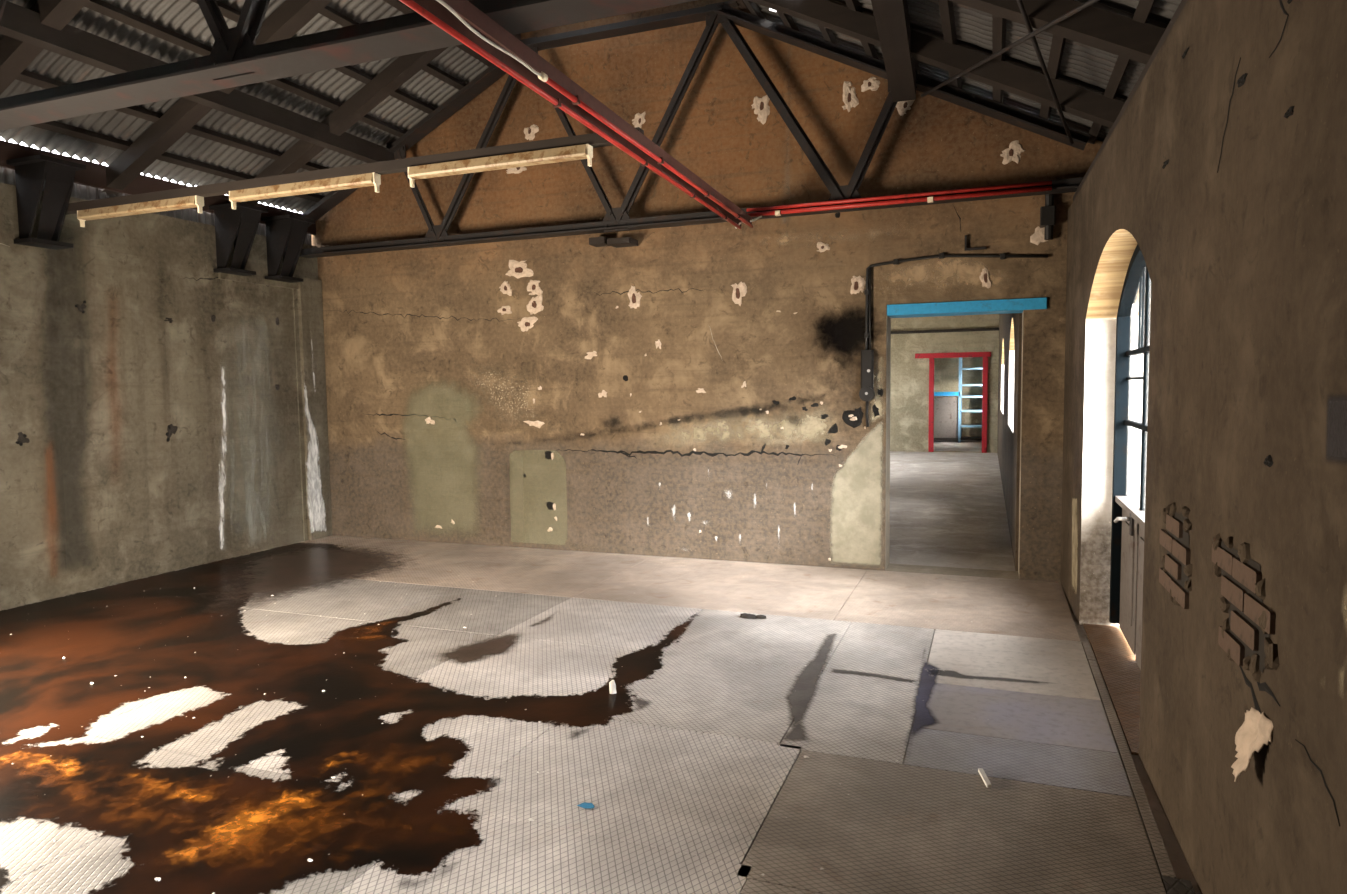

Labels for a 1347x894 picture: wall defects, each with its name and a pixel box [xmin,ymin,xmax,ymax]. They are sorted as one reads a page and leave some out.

flaking render [751,95,770,124]
flaking render [842,77,880,112]
flaking render [497,260,544,332]
damp [220,373,400,605]
crack [558,443,836,463]
peeling [660,366,883,565]
damp [443,635,519,663]
flaking render [1231,707,1273,782]